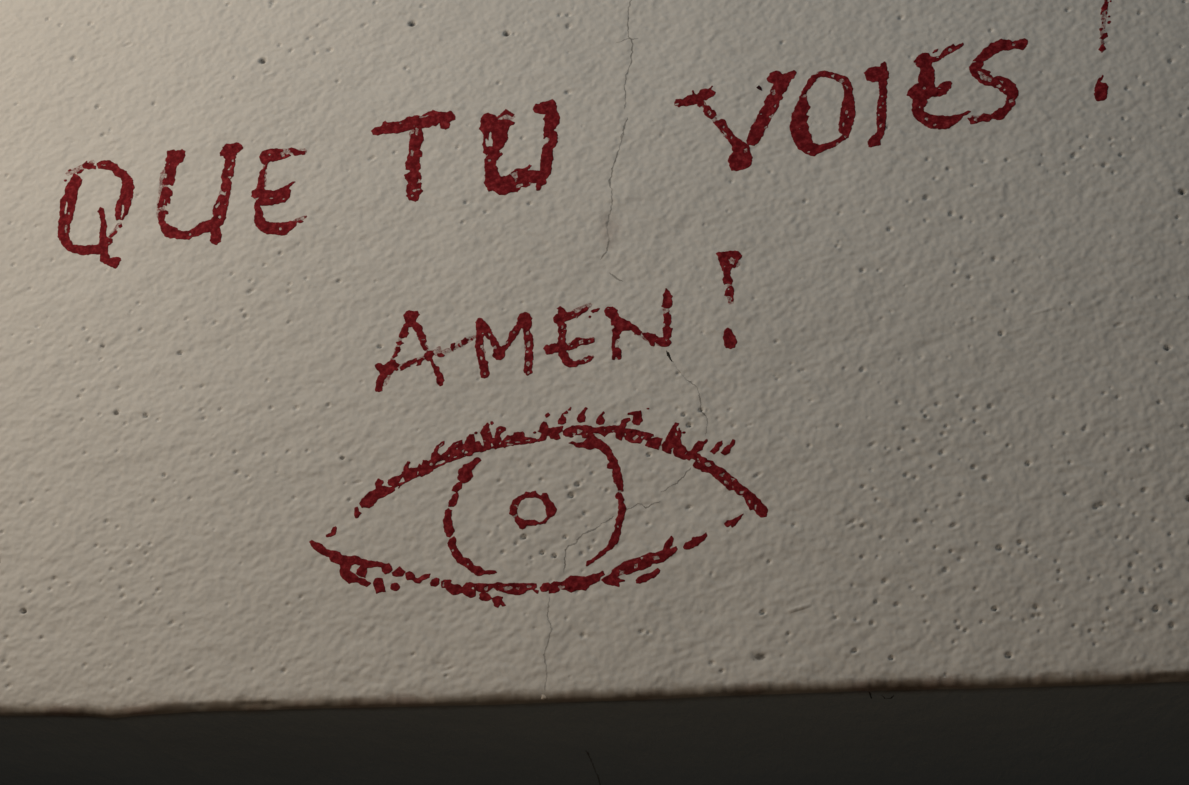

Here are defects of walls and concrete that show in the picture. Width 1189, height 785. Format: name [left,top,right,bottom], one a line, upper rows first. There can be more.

crack [601,0,638,282]
crack [666,350,708,433]
crack [563,468,691,572]
crack [543,597,552,690]